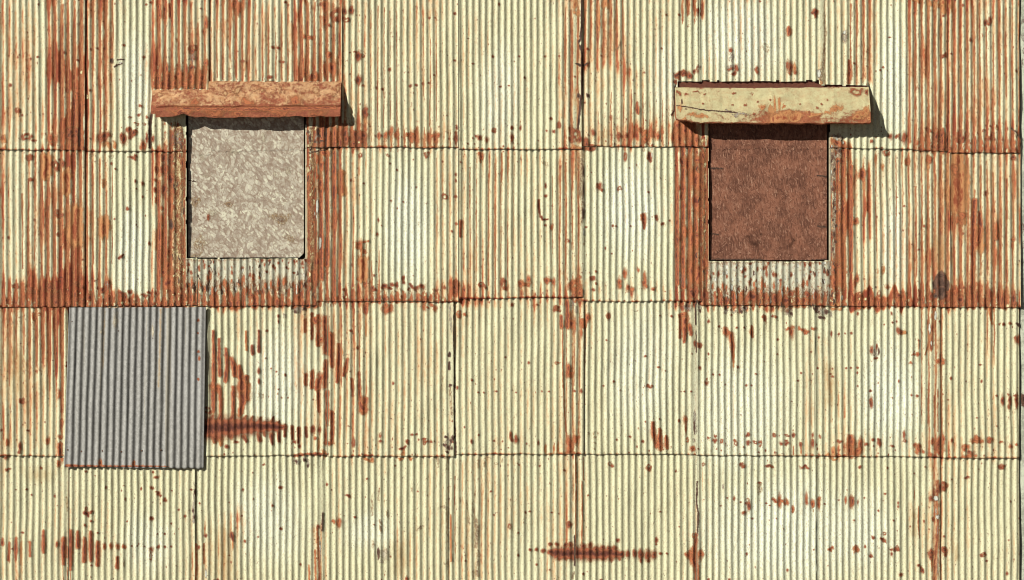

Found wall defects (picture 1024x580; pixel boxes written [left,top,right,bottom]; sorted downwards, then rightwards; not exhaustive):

corrosion [1,0,531,504]
corrosion [434,0,1020,580]
corrosion [1,507,186,580]